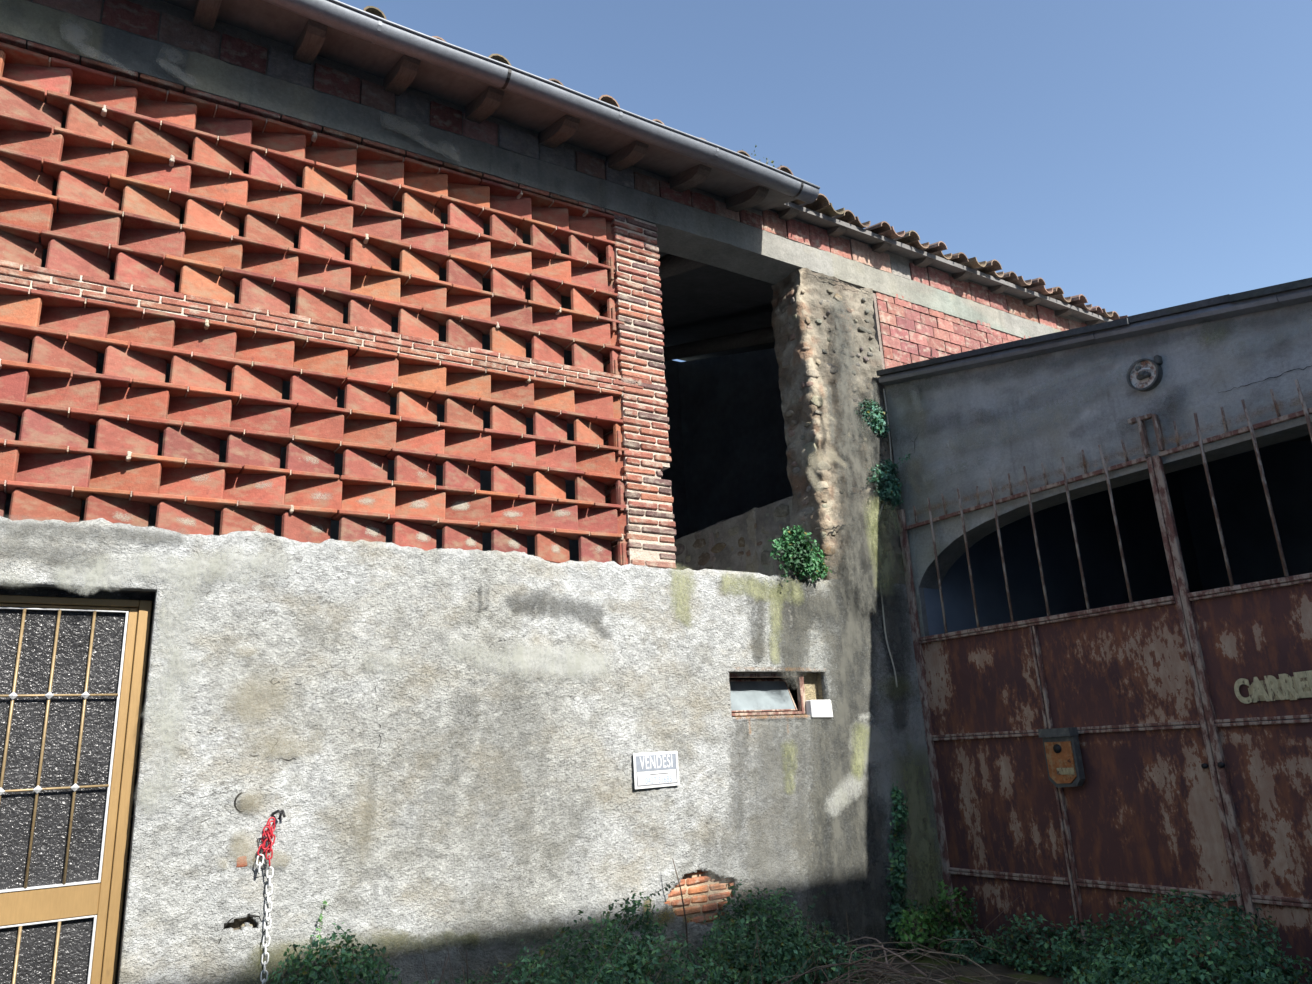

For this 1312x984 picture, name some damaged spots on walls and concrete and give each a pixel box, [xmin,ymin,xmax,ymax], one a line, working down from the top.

flaking render [665,870,734,927]
leakage [753,299,909,963]